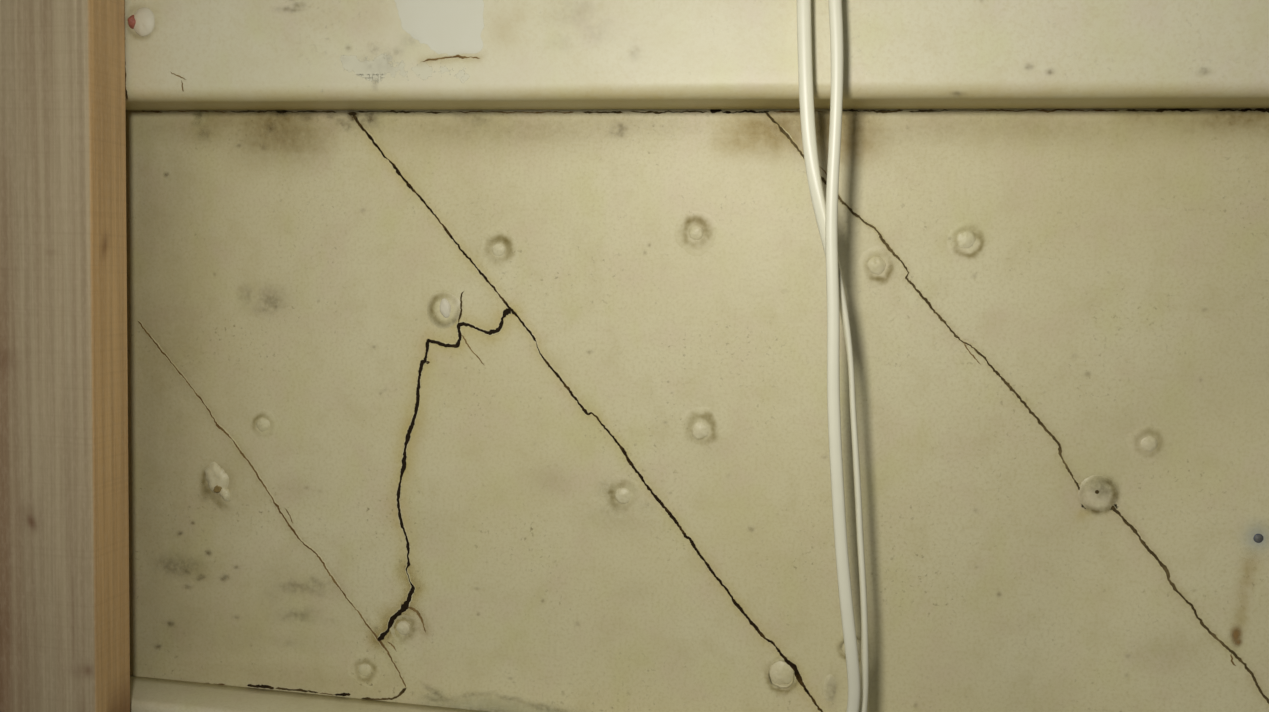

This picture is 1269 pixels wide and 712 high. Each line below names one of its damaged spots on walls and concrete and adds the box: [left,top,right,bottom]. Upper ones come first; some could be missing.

peeling [340,0,484,83]
crack [138,108,1269,712]